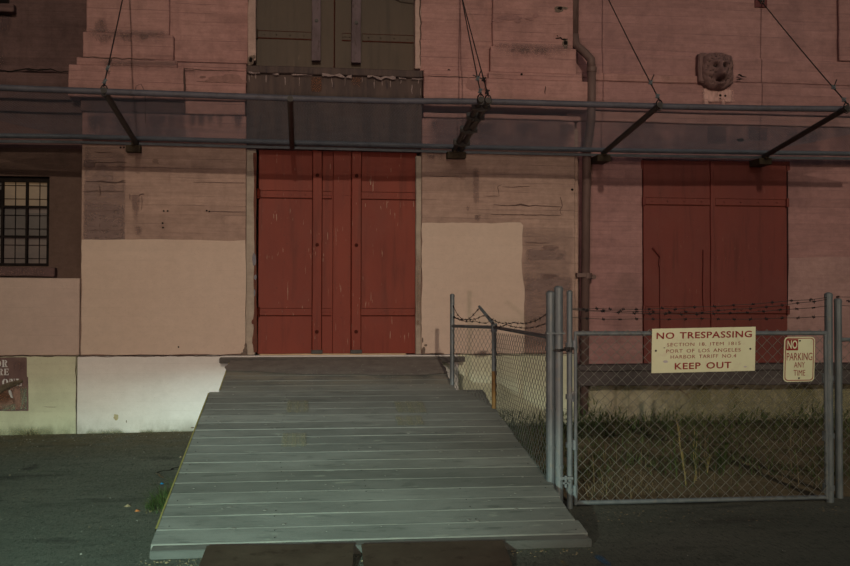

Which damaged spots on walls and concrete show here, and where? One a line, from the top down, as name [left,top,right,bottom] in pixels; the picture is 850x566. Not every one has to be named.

crack [0,56,155,73]